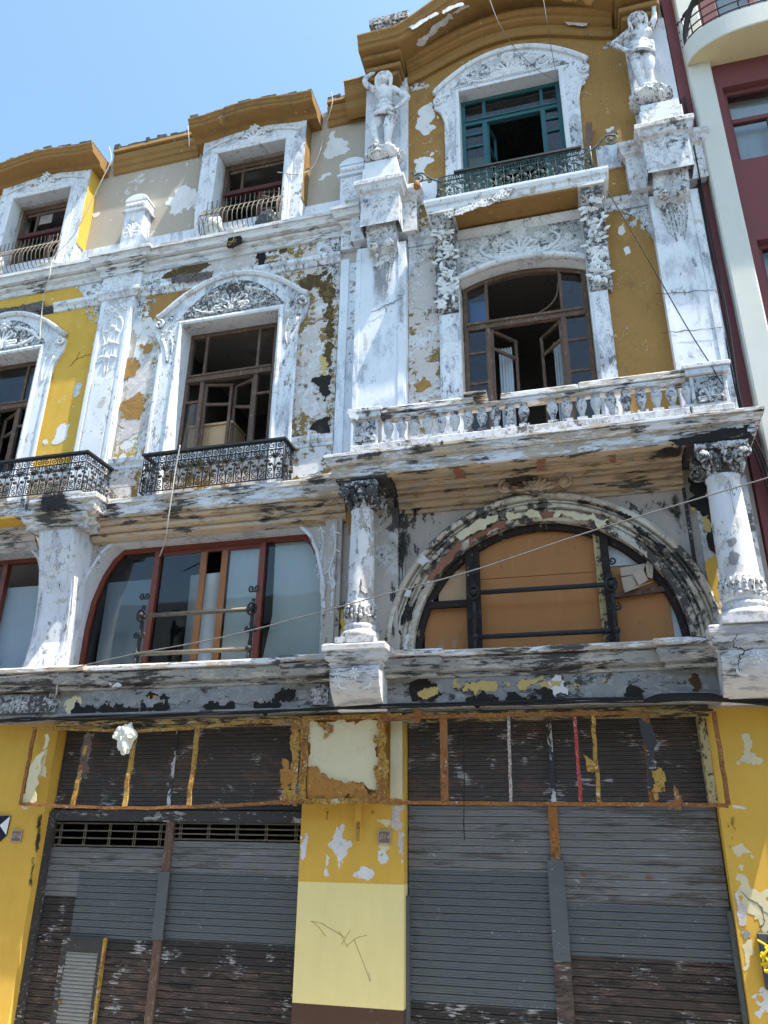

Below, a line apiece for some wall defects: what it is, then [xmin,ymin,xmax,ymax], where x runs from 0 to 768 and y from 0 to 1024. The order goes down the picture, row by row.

peeling [408,2,469,46]
peeling [415,102,436,135]
peeling [414,152,435,181]
peeling [118,263,213,444]
peeling [297,264,336,434]
peeling [399,500,666,650]
crack [732,634,753,668]
peeling [409,674,580,708]
peeling [324,824,353,876]
peeling [353,805,405,881]
peeling [732,843,768,933]
peeling [750,987,768,1018]